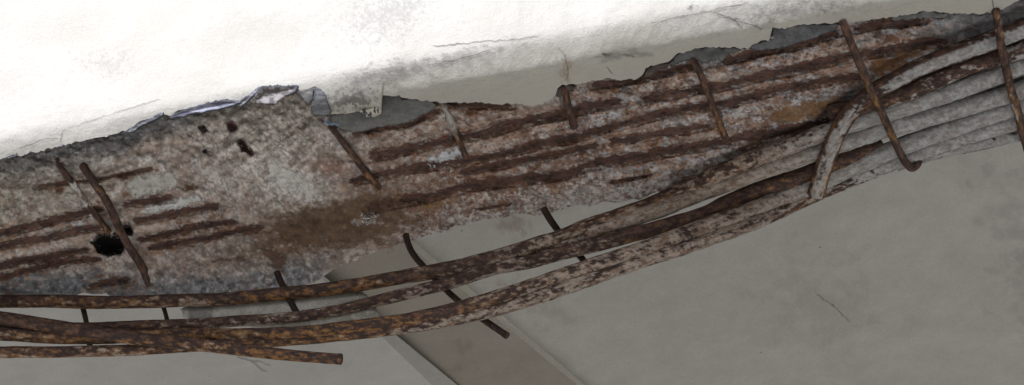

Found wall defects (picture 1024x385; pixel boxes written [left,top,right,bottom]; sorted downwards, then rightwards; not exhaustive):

rust [0,206,133,289]
rust [37,18,948,273]
spalling [0,0,1024,296]